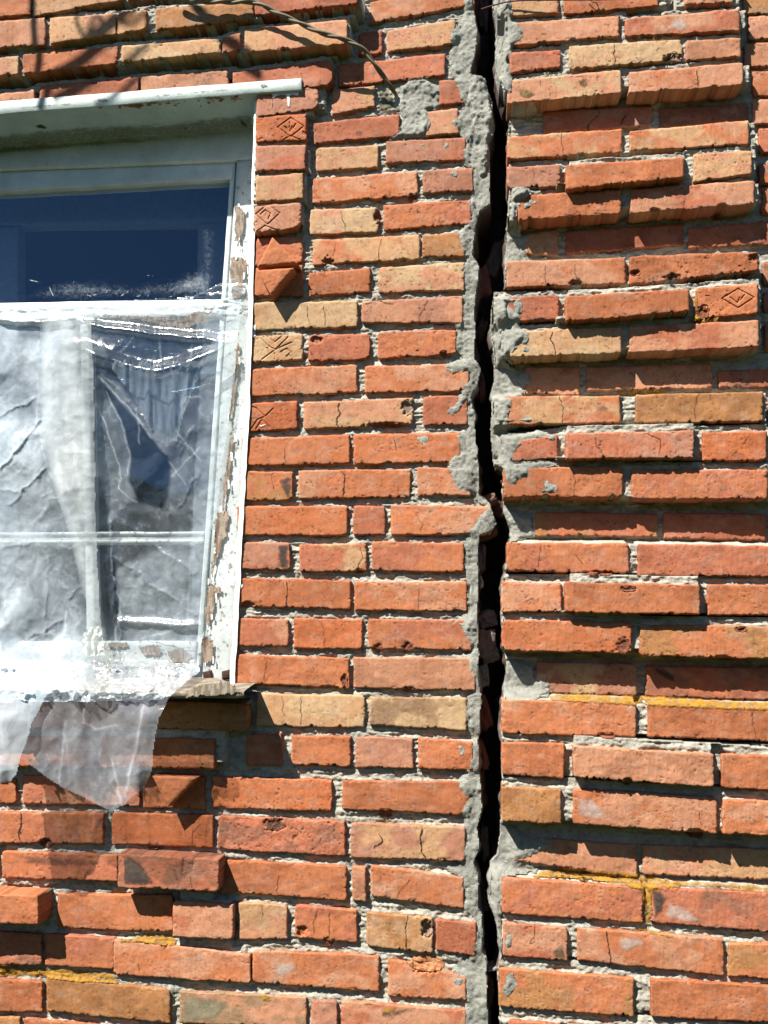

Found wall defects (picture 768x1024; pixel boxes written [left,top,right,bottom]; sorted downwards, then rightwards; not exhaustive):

peeling [229,204,248,299]
peeling [228,342,241,421]
peeling [108,433,236,666]
crack [470,0,512,1024]